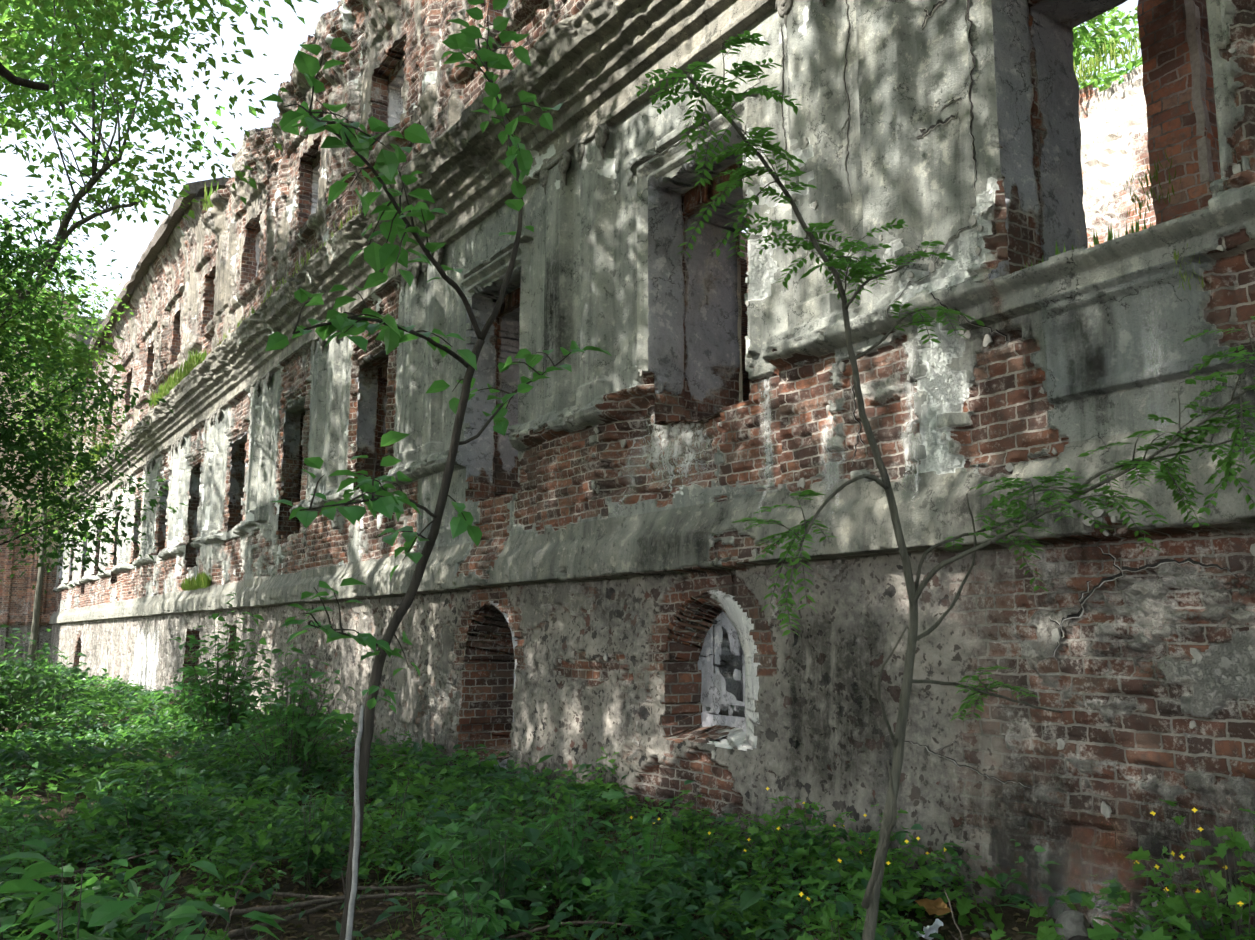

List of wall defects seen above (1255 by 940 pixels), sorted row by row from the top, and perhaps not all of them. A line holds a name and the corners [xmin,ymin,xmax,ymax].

crack [839,0,852,202]
crack [917,0,977,190]
flaking render [717,173,1069,498]
crack [886,226,1009,347]
flaking render [454,409,631,582]
flaking render [703,529,777,571]
crack [1049,546,1237,660]
flaking render [1041,534,1255,939]